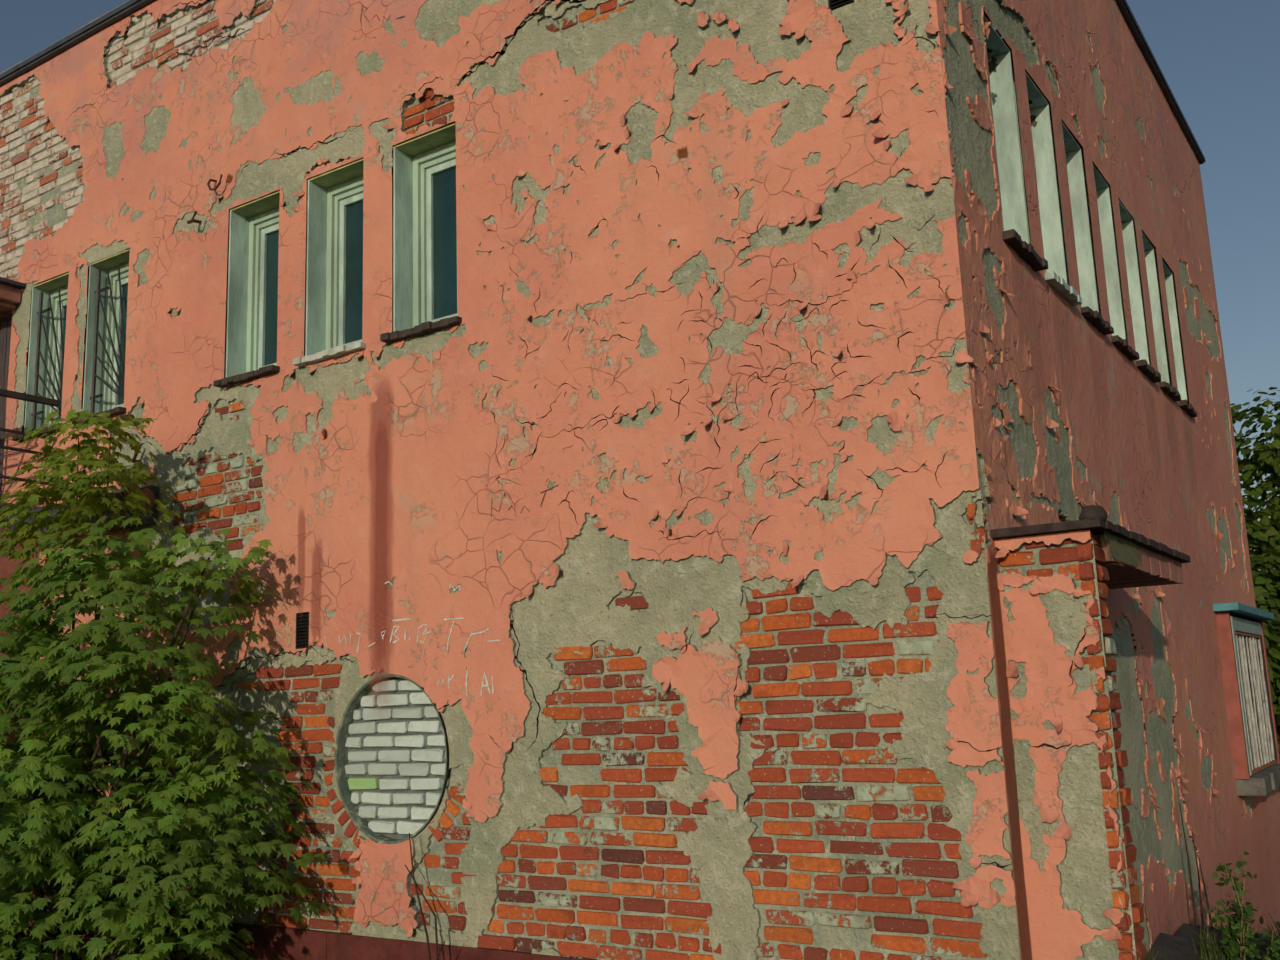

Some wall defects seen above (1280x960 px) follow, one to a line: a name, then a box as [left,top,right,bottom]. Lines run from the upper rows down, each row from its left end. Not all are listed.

flaking render [0,74,86,431]
peeling [71,240,153,417]
peeling [102,94,171,181]
peeling [119,179,157,222]
peeling [167,307,181,318]
flaking render [111,324,489,631]
flaking render [196,0,1220,960]
crack [490,210,956,540]
crack [990,363,1039,443]
crack [984,458,1056,511]
peeling [1174,251,1249,594]